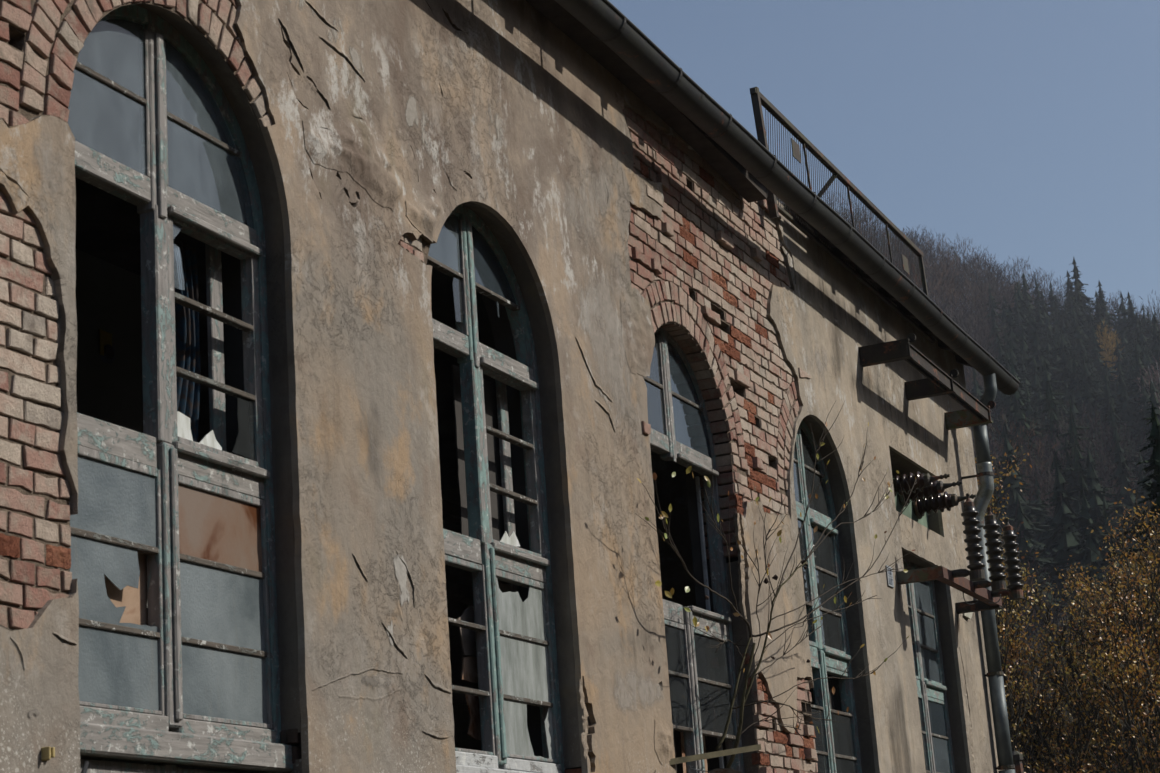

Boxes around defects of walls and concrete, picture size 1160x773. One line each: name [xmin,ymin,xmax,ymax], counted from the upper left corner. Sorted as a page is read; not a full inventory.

spalling [0,0,275,128]
spalling [0,191,72,670]
spalling [615,92,811,521]
spalling [743,653,818,773]